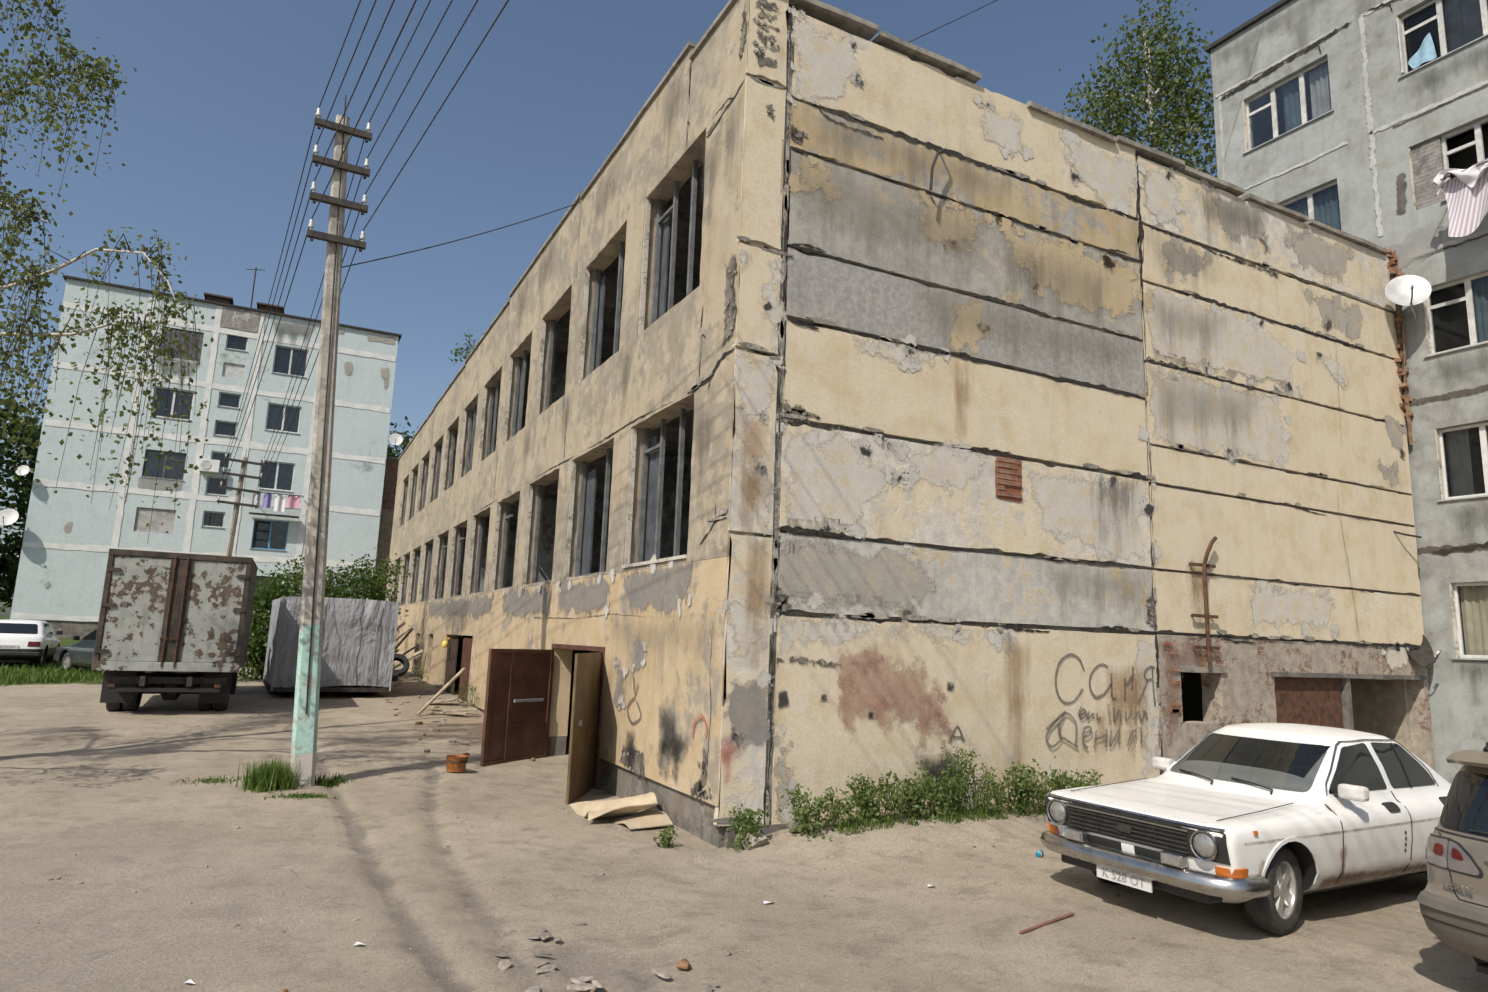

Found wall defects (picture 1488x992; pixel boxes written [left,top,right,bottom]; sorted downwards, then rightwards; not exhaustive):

peeling [738,0,868,203]
peeling [973,92,1034,161]
peeling [918,126,1363,470]
crack [467,2,1421,828]
peeling [722,250,1162,824]
crack [1431,541,1488,555]
peeling [1249,578,1340,639]
peeling [1381,642,1409,670]
damp [839,671,857,730]